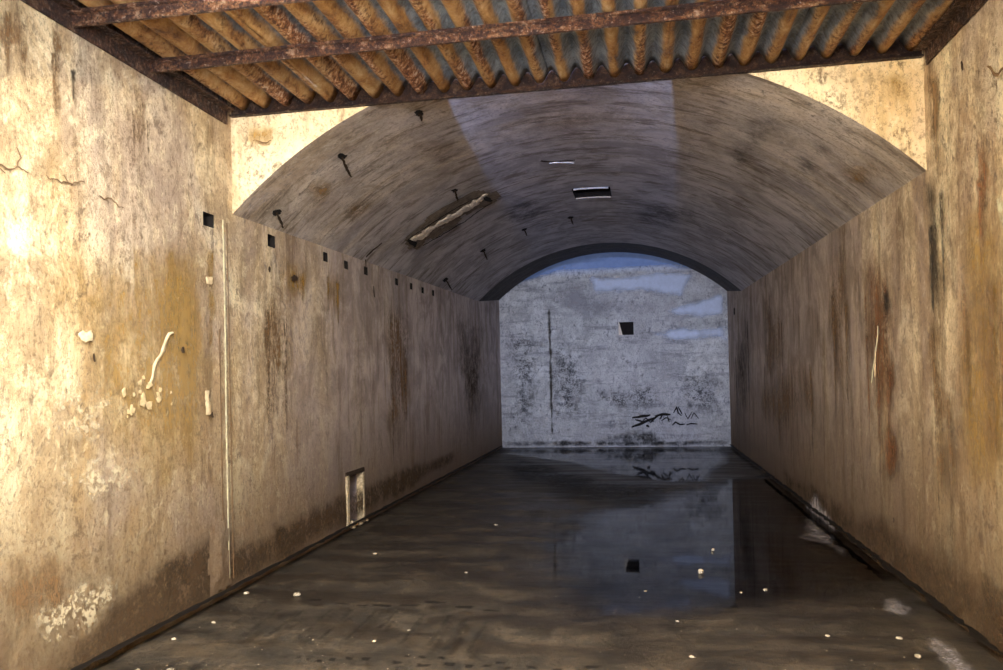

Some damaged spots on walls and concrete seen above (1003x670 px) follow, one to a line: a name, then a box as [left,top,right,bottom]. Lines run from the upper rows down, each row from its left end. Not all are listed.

crack [0,147,124,208]
leakage [928,190,945,309]
peeling [122,332,174,418]
rust [865,268,896,472]
leakage [227,454,452,579]
leakage [7,545,210,670]